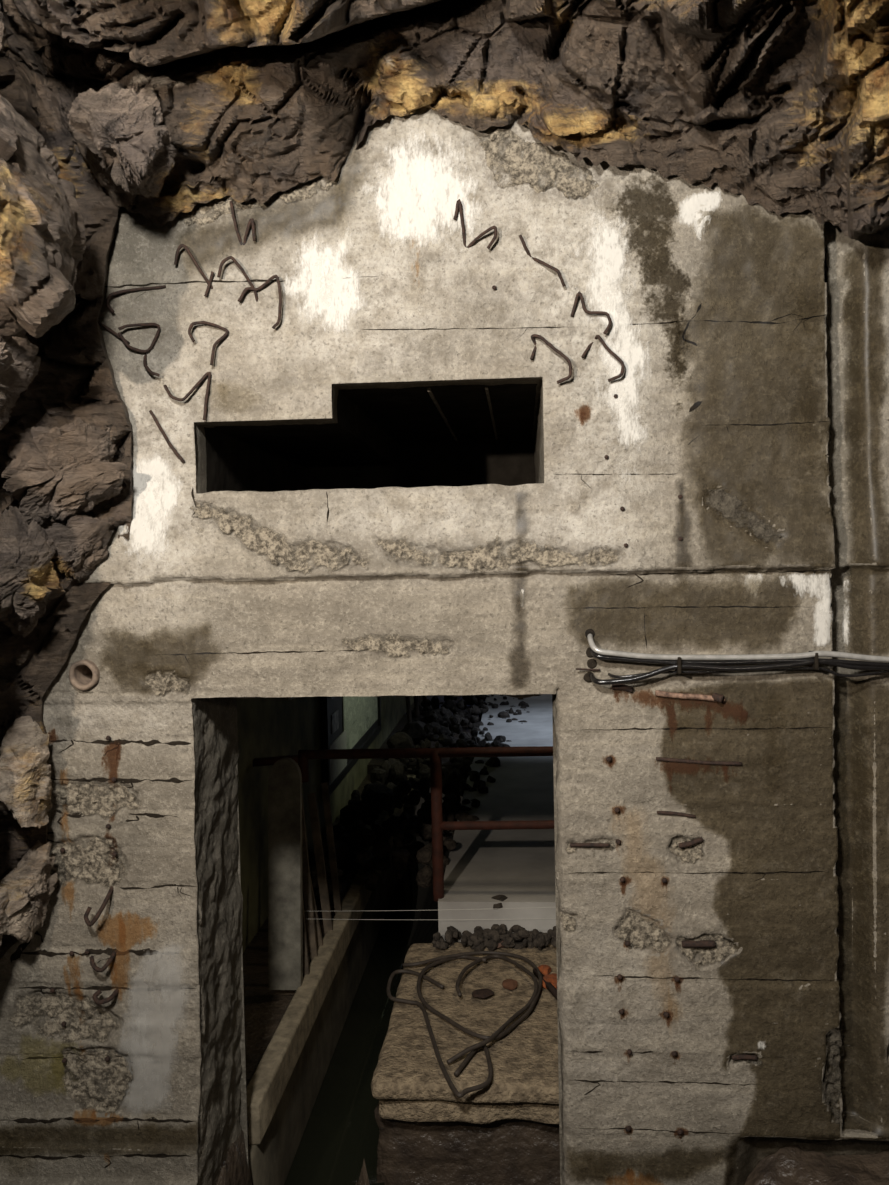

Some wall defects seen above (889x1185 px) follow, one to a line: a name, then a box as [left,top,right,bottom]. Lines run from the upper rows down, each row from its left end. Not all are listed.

crack [822,245,830,283]
leakage [588,178,720,445]
spalling [190,502,368,574]
leakage [676,485,689,567]
leakage [745,574,762,593]
efflorescence [783,574,848,646]
spalling [145,671,189,696]
spalling [53,782,140,820]
spalling [49,835,128,889]
spalling [615,907,736,970]
spalling [7,991,132,1113]
crack [823,1007,842,1117]